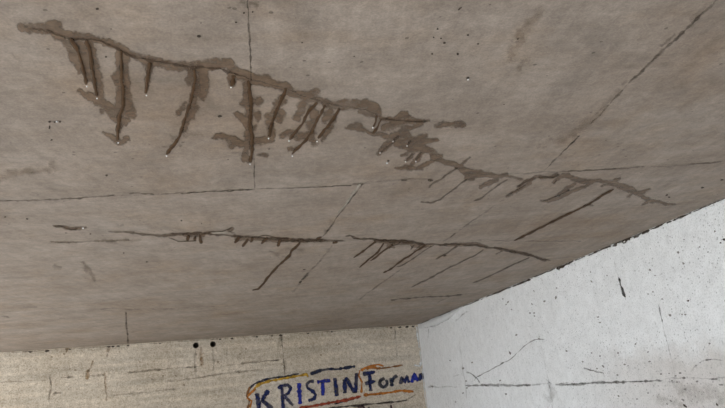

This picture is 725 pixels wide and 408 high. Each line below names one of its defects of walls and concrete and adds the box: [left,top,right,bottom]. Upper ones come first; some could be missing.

damp [17,20,676,241]
crack [462,338,544,394]
crack [556,368,698,386]